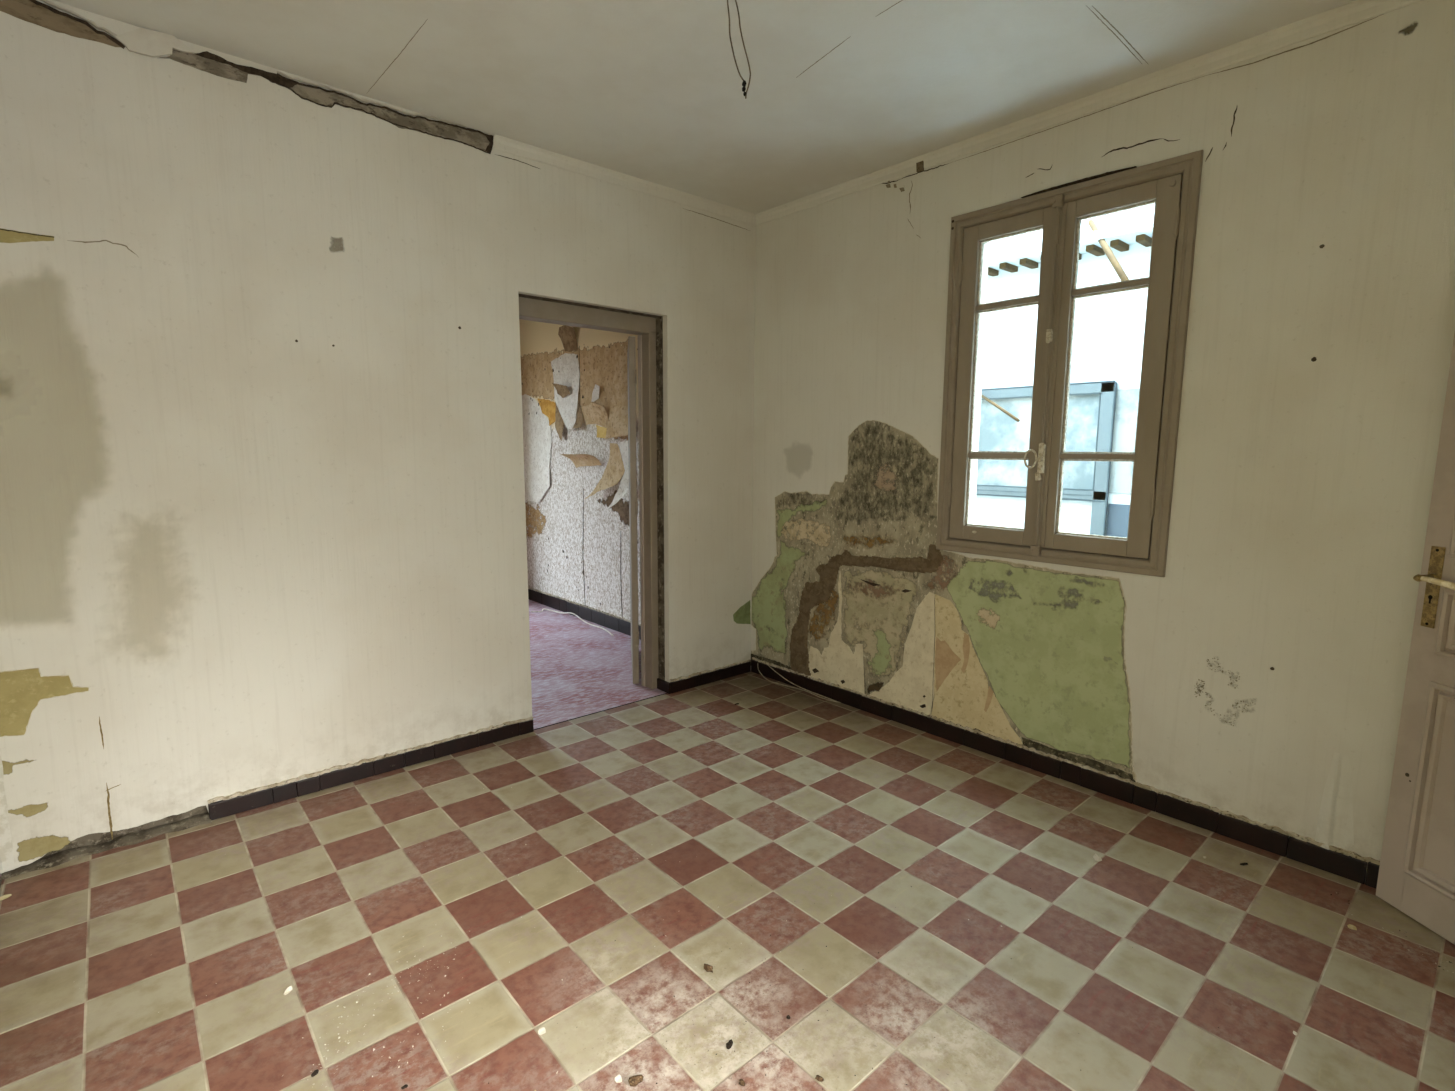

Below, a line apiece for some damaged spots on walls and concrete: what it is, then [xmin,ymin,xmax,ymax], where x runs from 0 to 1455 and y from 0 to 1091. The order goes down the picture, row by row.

flaking render [0,0,493,154]
crack [881,6,1383,236]
peeling [0,228,139,258]
flaking render [733,420,1137,783]
peeling [0,668,89,737]
peeling [2,760,34,774]
peeling [8,803,48,817]
peeling [17,835,70,862]